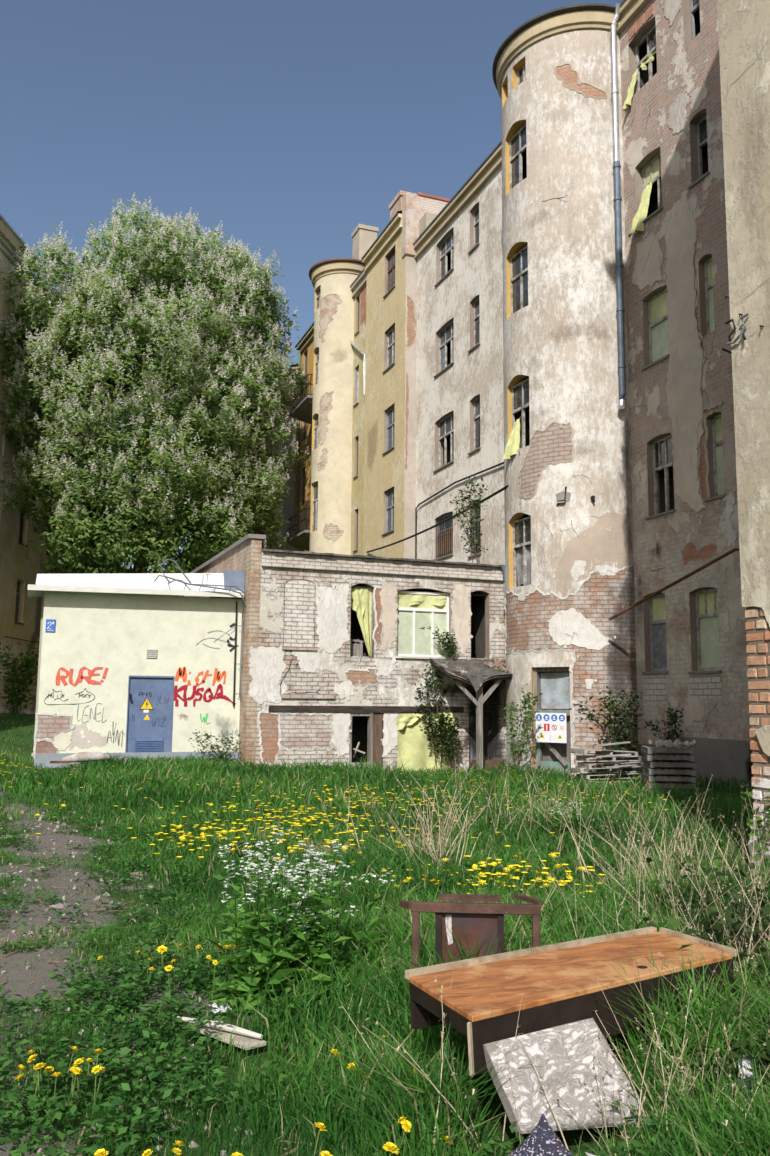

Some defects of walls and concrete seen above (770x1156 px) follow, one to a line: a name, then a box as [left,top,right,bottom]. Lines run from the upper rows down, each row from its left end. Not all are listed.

flaking render [554,62,607,100]
crack [694,183,715,404]
flaking render [632,190,736,519]
flaking render [518,420,575,500]
flaking render [681,542,717,565]
flaking render [249,584,352,765]
flaking render [330,581,398,700]
flaking render [505,508,638,772]
flaking render [31,712,107,759]
flaking render [381,715,398,757]
flaking render [755,725,770,756]